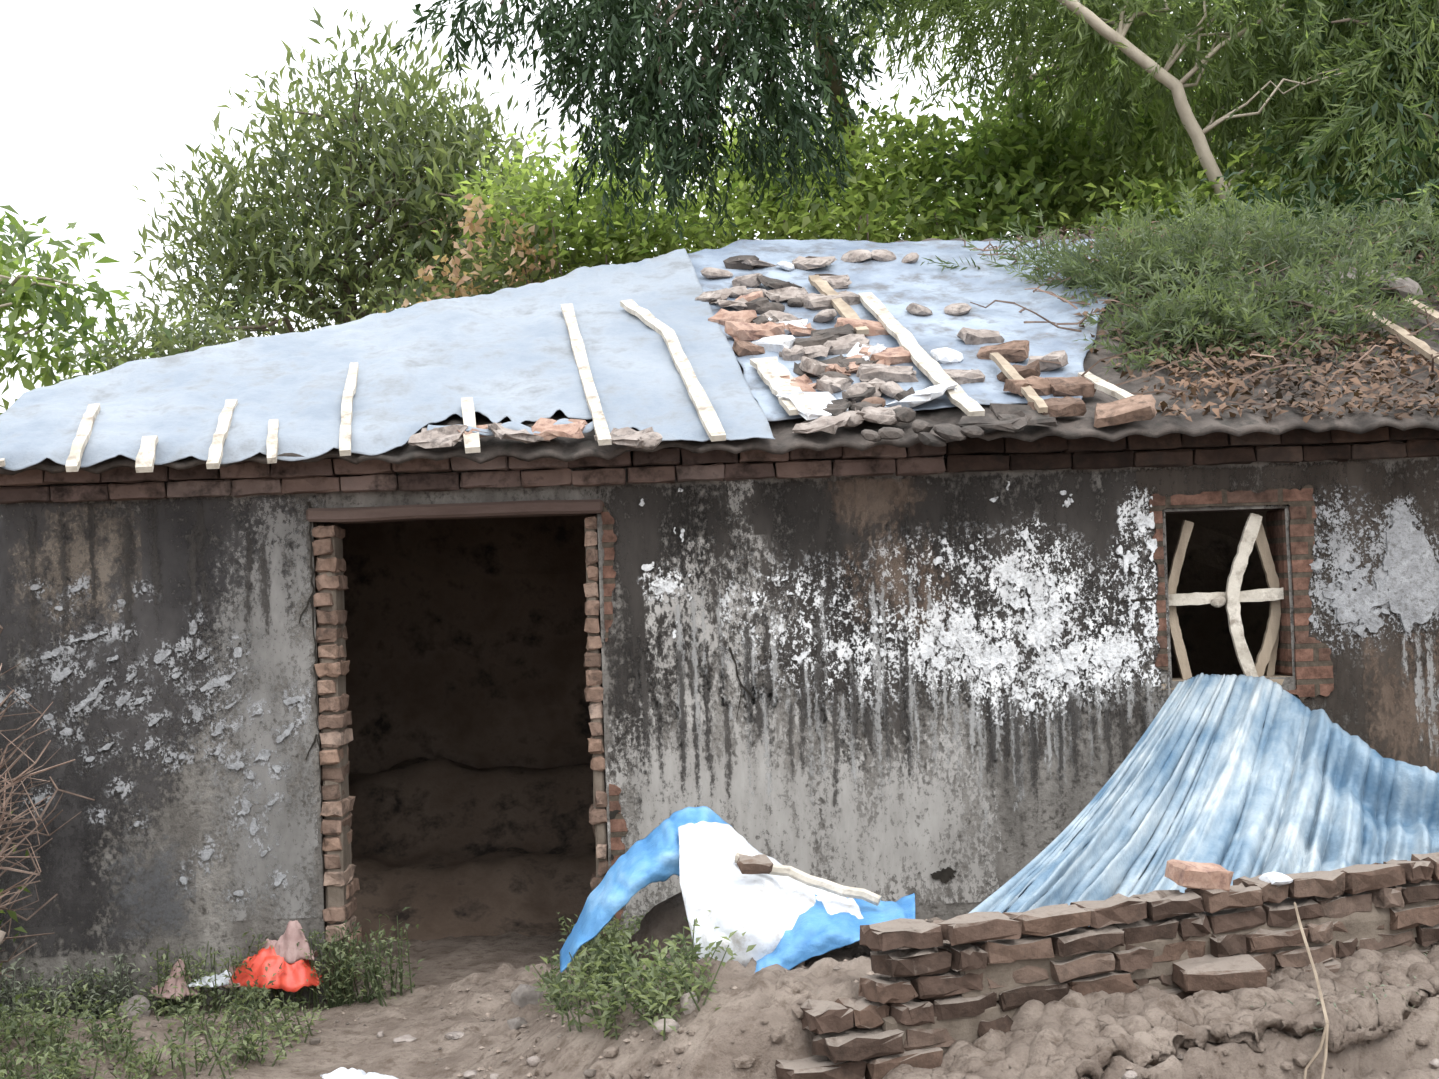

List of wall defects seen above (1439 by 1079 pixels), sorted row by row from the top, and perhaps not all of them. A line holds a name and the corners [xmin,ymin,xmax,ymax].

peeling [0,576,311,903]
water stain [0,495,326,959]
water stain [621,875,681,917]
peeling [640,562,700,602]
water stain [584,468,1171,904]
peeling [719,484,1439,727]